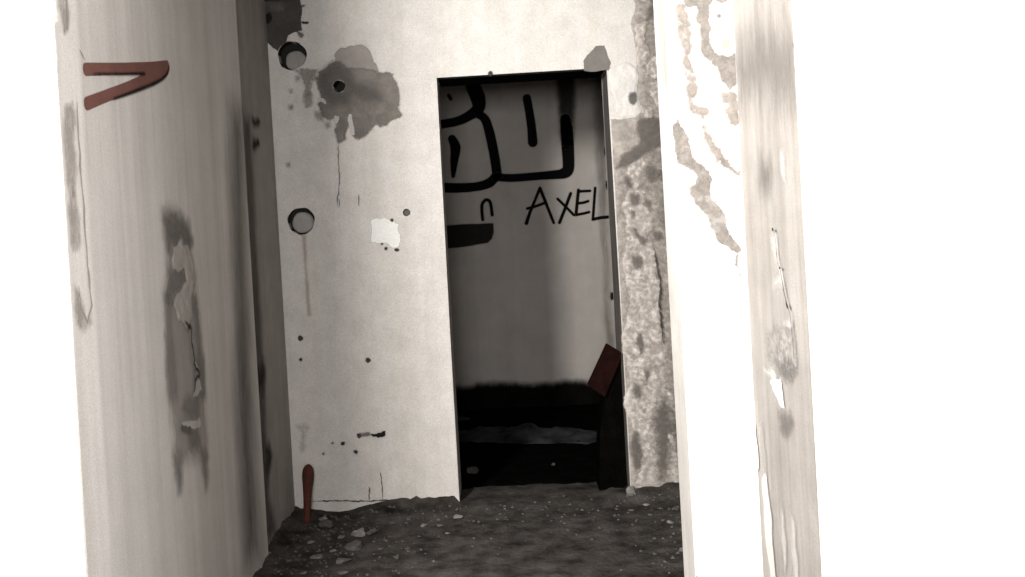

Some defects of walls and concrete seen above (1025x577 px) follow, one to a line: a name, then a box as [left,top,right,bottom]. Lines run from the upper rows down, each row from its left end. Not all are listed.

water stain [316,45,402,142]
spalling [583,46,611,72]
spalling [165,215,207,487]